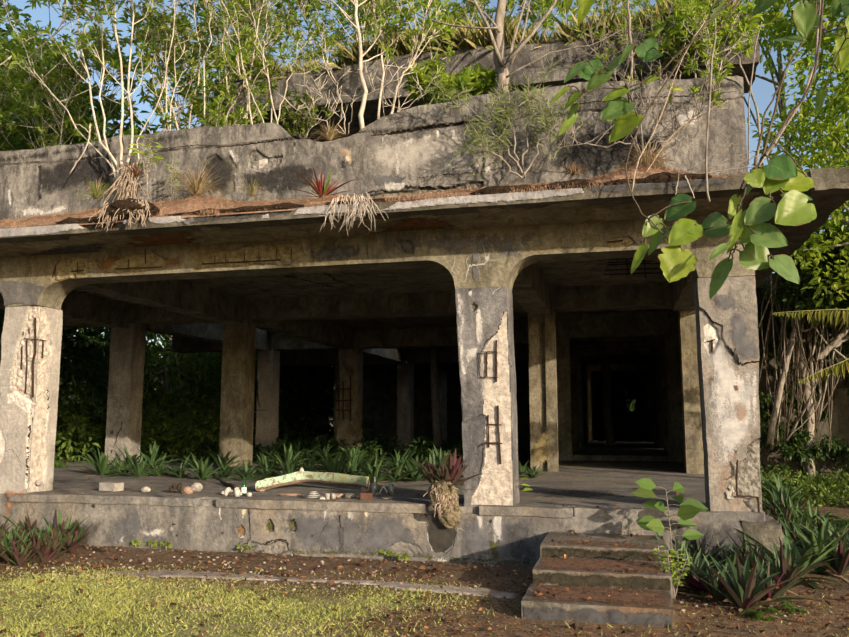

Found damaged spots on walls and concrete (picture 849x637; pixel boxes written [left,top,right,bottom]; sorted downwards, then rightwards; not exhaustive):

spalling [248,150,283,173]
spalling [52,257,94,282]
spalling [106,249,167,274]
crack [452,246,495,281]
crack [482,288,511,380]
spalling [0,268,54,492]
spalling [461,311,513,506]
peeling [699,307,784,563]
crack [233,508,289,554]